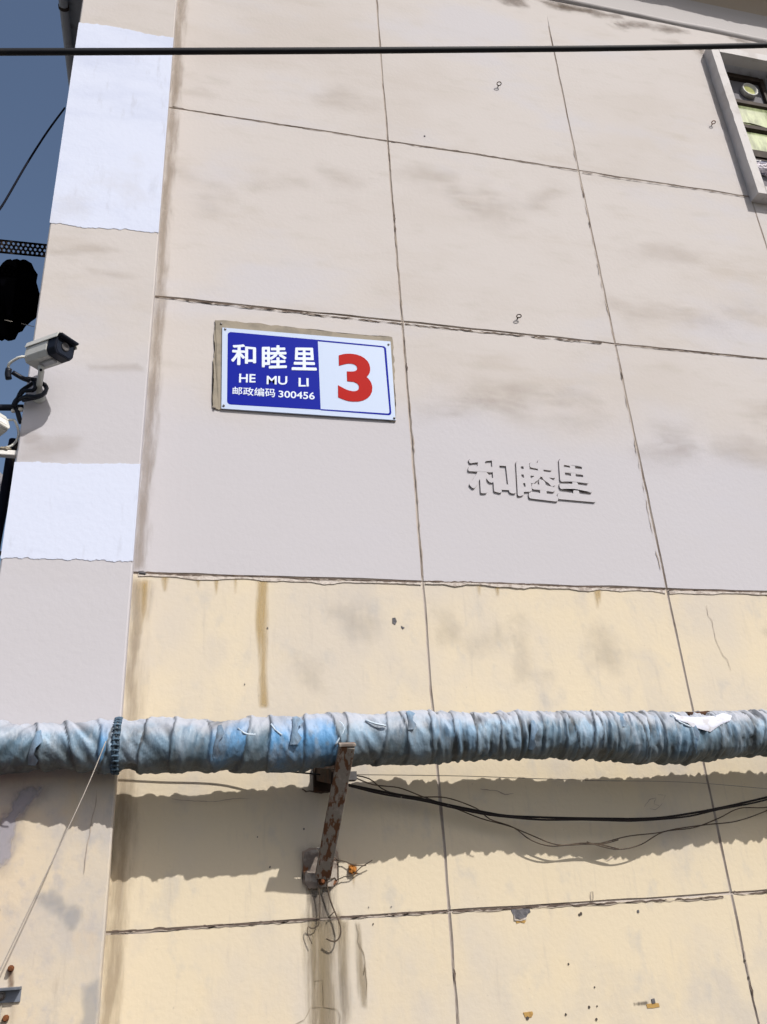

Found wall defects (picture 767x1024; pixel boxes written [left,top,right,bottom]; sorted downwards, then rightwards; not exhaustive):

leakage [310,887,330,1024]
crack [112,890,767,996]